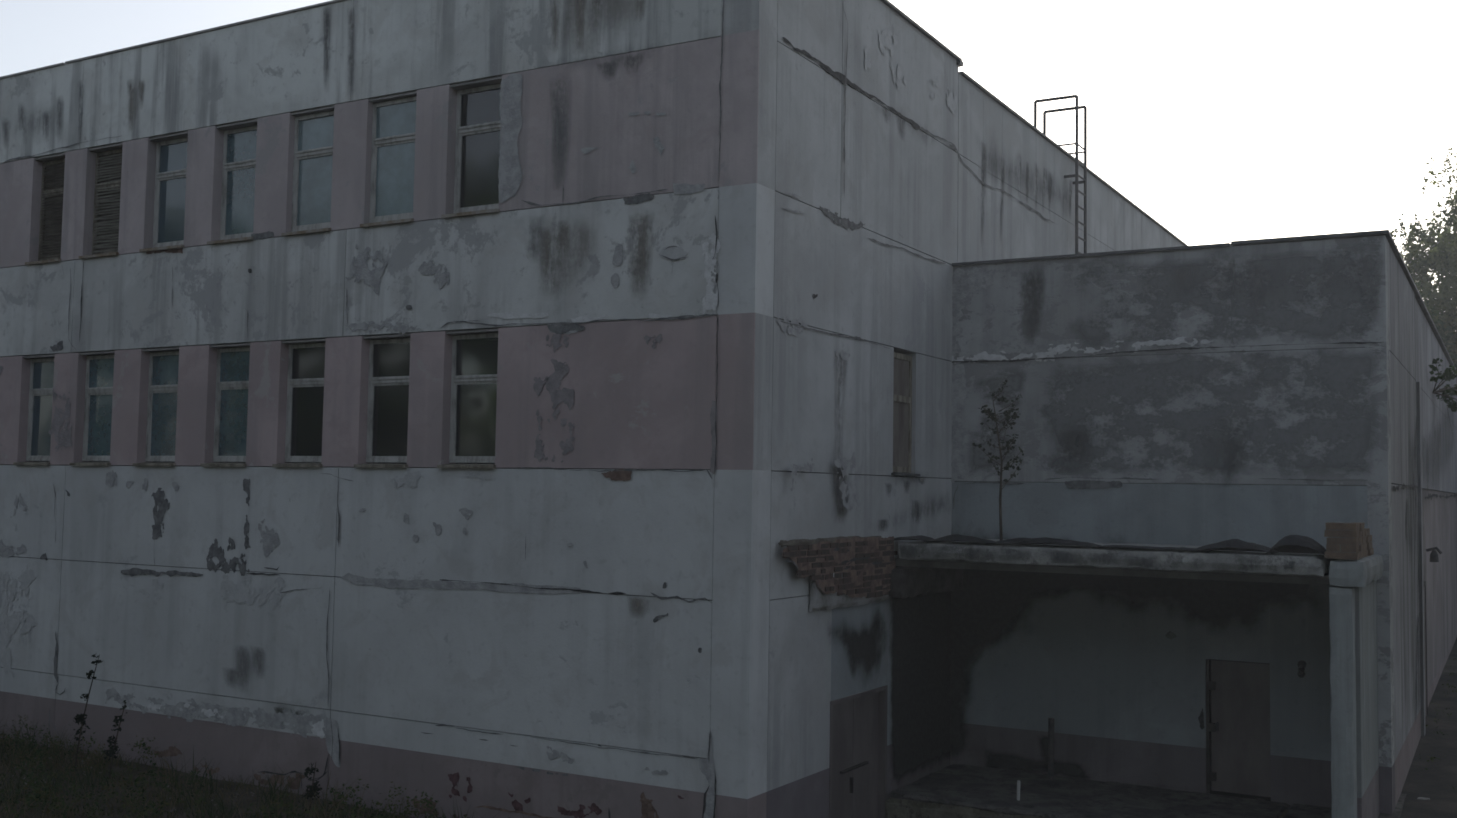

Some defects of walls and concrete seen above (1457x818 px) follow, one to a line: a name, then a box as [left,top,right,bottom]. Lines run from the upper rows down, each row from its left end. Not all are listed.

peeling [487,312,608,410]
peeling [105,470,179,540]
peeling [206,479,280,576]
spalling [782,536,897,598]